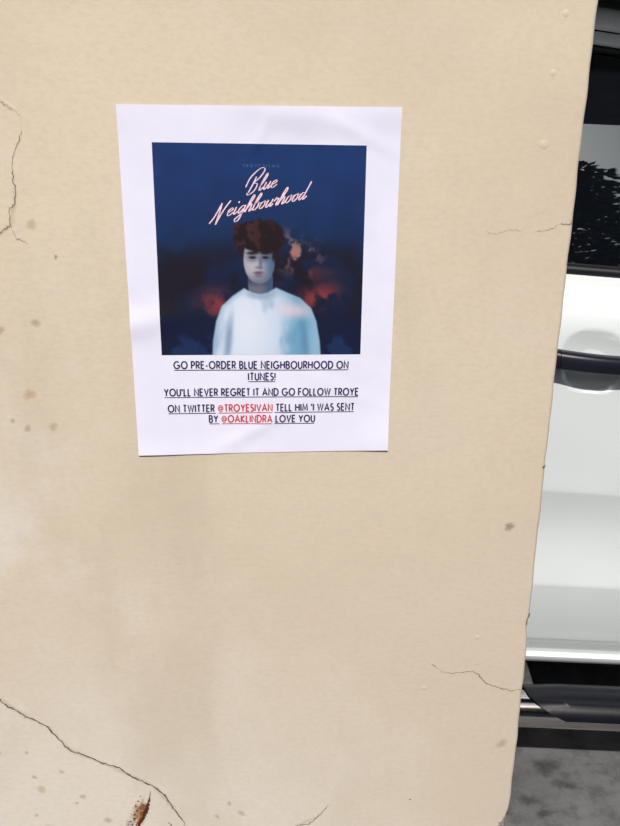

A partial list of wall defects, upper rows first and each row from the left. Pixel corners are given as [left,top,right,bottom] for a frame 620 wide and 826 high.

crack [0,132,24,242]
crack [0,699,185,826]
rust [129,796,150,826]